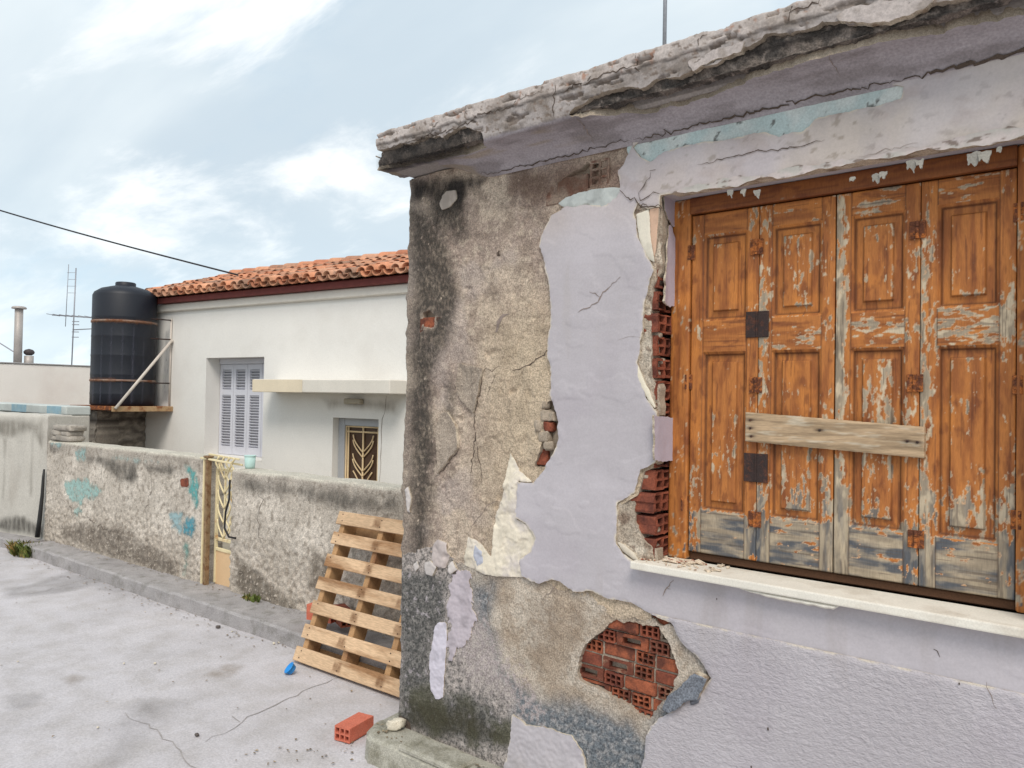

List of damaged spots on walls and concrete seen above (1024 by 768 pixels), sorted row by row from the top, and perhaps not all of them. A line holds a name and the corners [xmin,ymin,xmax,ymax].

spalling [378,128,484,166]
crack [384,47,1024,175]
damp [101,460,136,480]
damp [412,179,477,550]
crack [440,350,547,528]
spalling [398,86,904,768]
spalling [617,126,1024,561]